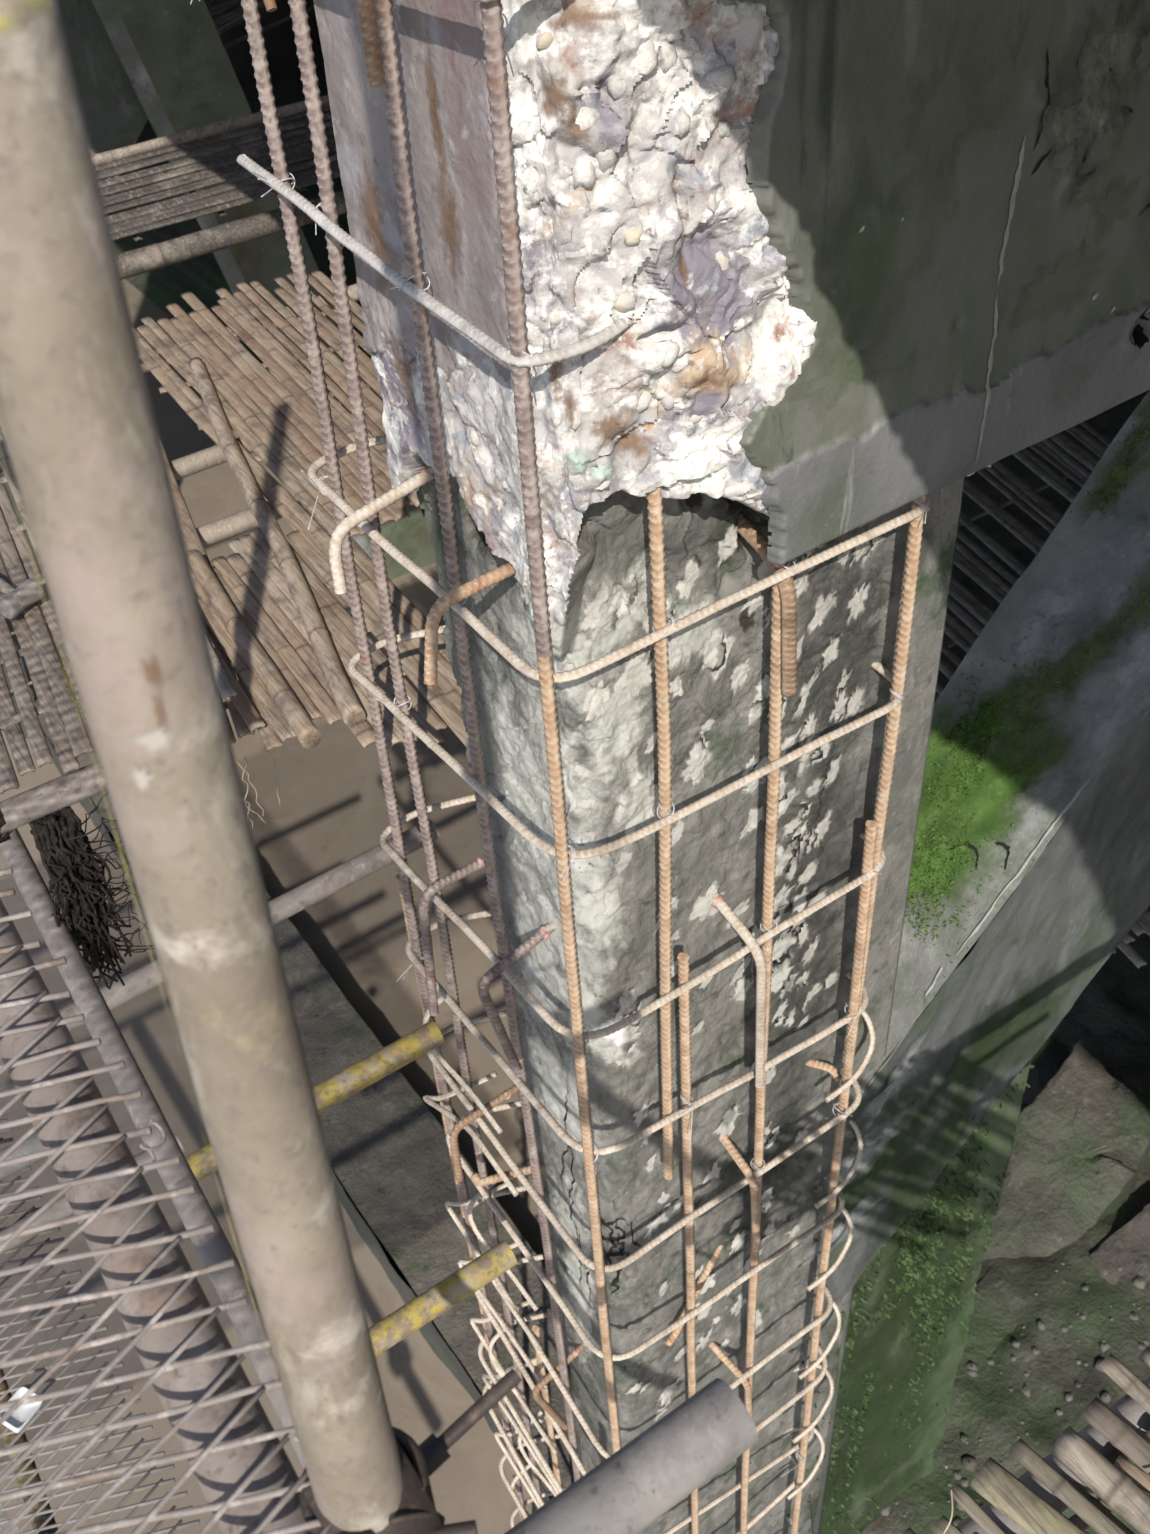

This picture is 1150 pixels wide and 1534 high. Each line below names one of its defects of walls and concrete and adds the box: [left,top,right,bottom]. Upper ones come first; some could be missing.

spalling [371,0,817,722]
water stain [990,530,1150,747]
spalling [655,525,883,1029]
spalling [604,851,632,918]
spalling [600,988,644,1066]
spalling [633,1102,656,1172]
spalling [714,1105,741,1139]
spalling [764,1121,808,1149]
spalling [644,1192,684,1239]
spalling [729,1188,800,1272]
water stain [809,993,1050,1534]
spalling [626,1265,762,1421]